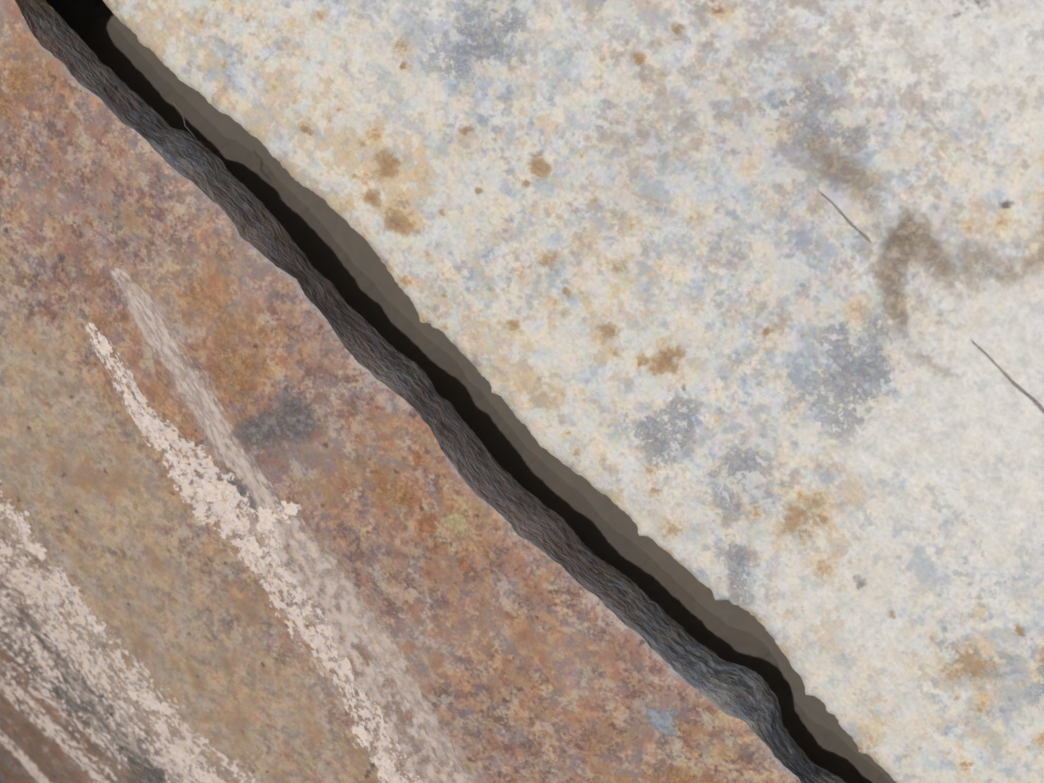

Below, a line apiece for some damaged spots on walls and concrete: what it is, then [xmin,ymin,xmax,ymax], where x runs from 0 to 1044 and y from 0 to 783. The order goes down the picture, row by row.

rust [375,150,400,177]
rust [523,154,551,187]
rust [364,190,413,235]
rust [600,325,616,339]
rust [637,347,685,375]
crack [15,0,846,783]
peeling [89,323,302,561]
rust [784,499,827,537]
rust [956,651,995,677]
peeling [113,683,215,783]
peeling [351,721,393,783]